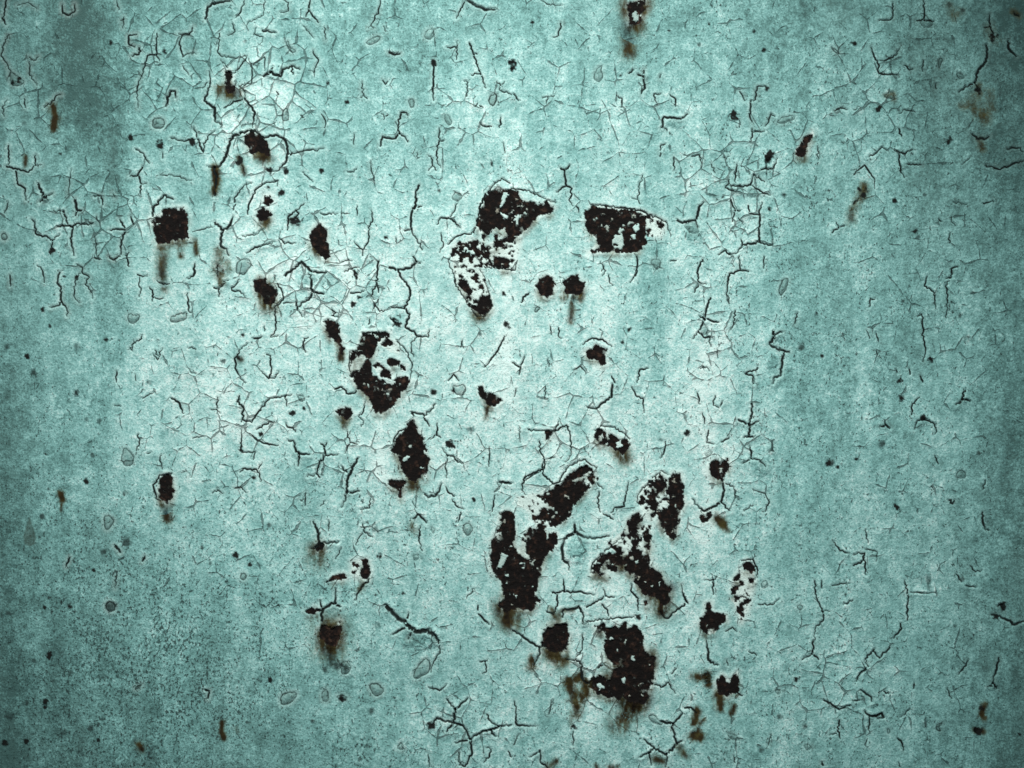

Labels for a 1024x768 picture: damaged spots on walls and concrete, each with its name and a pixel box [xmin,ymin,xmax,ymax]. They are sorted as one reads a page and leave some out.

rust [619,0,651,58]
crack [870,13,1019,92]
crack [0,0,704,622]
crack [616,69,798,512]
crack [880,201,994,464]
rust [305,607,345,657]
crack [385,605,553,768]
crack [467,589,545,666]
crack [488,368,717,684]
crack [640,668,697,768]
crack [802,530,869,660]
crack [823,580,935,767]